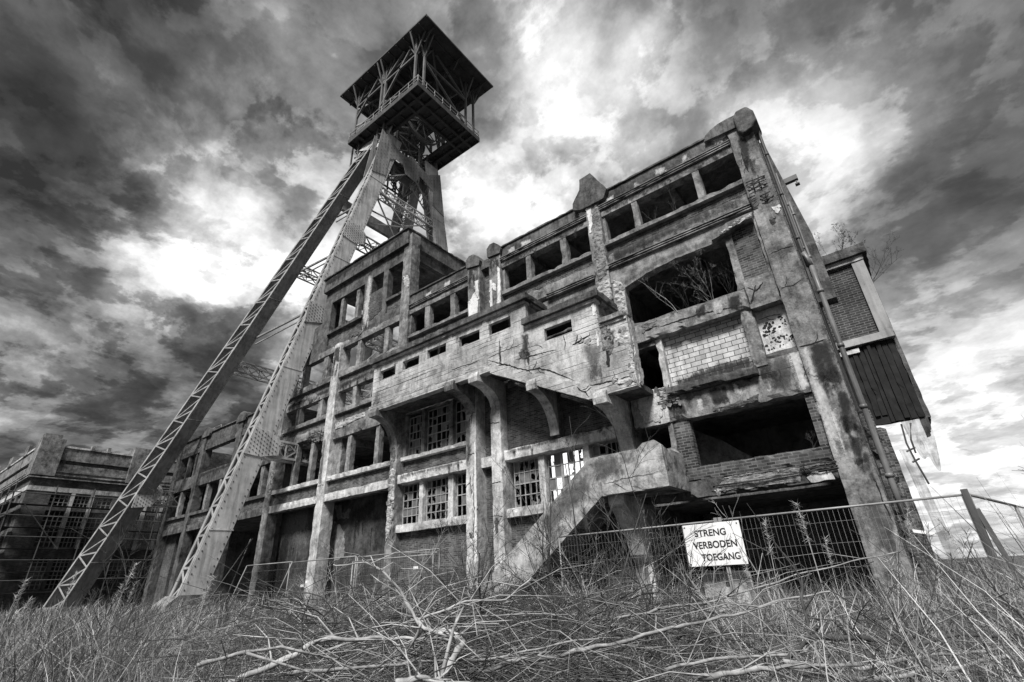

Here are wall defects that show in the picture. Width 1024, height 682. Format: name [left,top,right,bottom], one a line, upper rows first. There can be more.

peeling [468,267,501,316]
peeling [762,315,793,351]
crack [377,334,630,404]
peeling [637,384,682,424]
leakage [677,341,874,479]